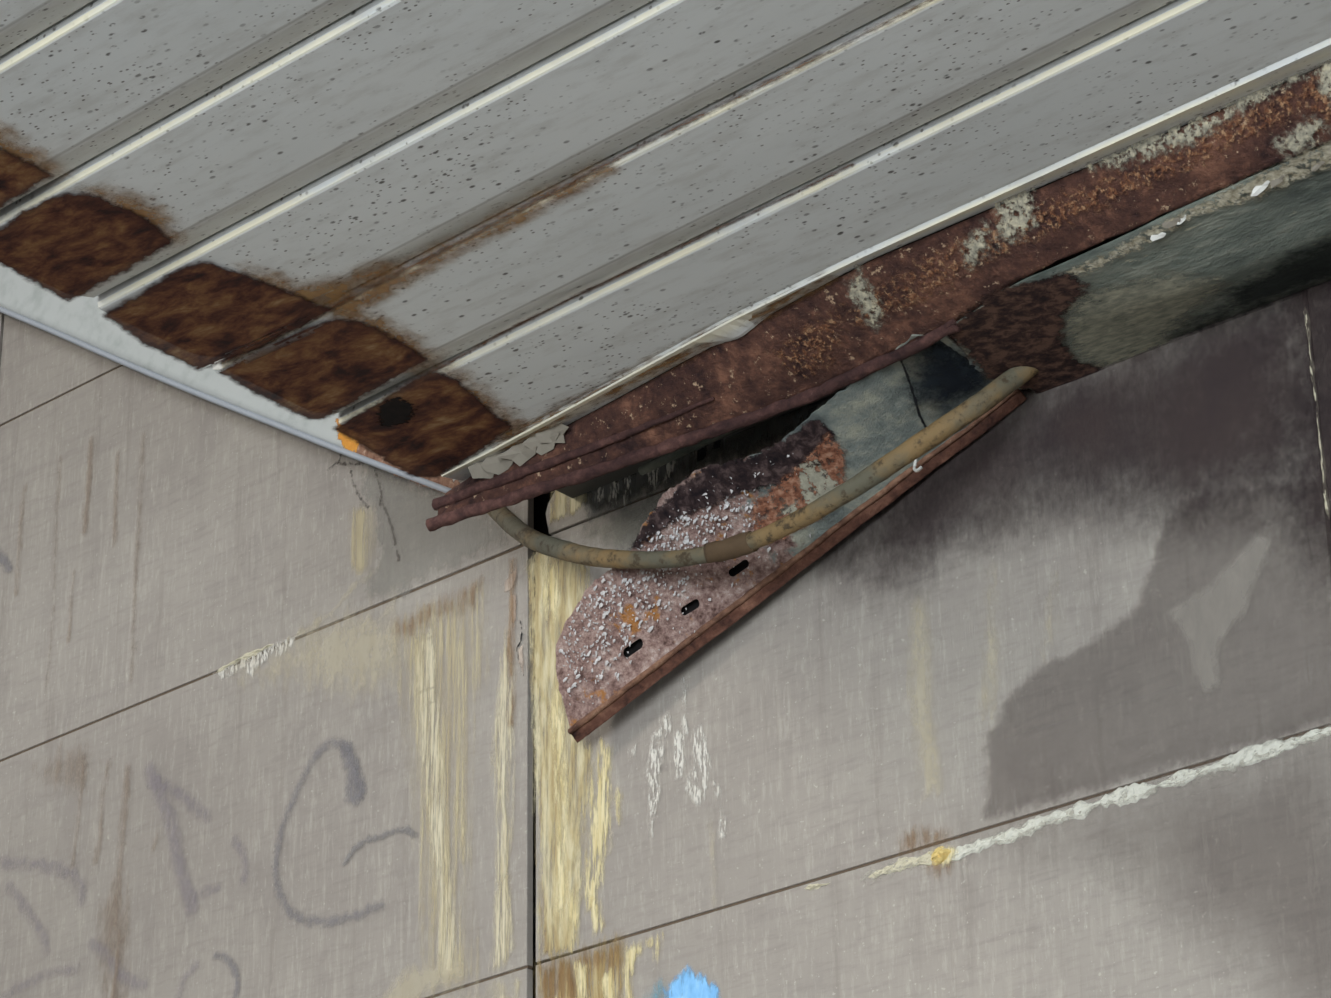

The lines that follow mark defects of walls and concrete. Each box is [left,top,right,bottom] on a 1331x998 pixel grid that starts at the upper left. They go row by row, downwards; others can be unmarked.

rust [0,129,178,302]
rust [103,0,934,494]
rust [629,419,847,549]
rust [773,73,1331,393]
water stain [832,239,1331,571]
water stain [868,726,1331,879]